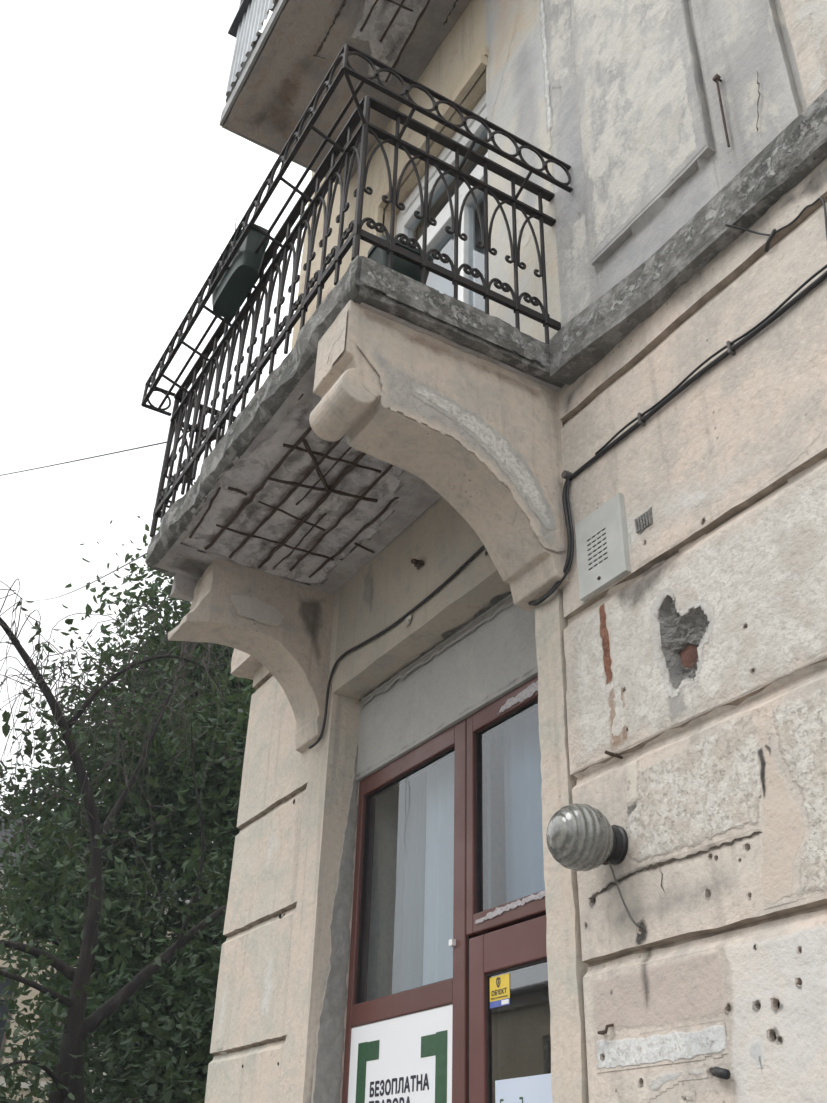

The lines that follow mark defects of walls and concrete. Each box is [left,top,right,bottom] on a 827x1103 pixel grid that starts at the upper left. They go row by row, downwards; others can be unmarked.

spalling [181,394,402,584]
peeling [330,307,579,587]
spalling [359,592,514,709]
peeling [564,426,827,903]